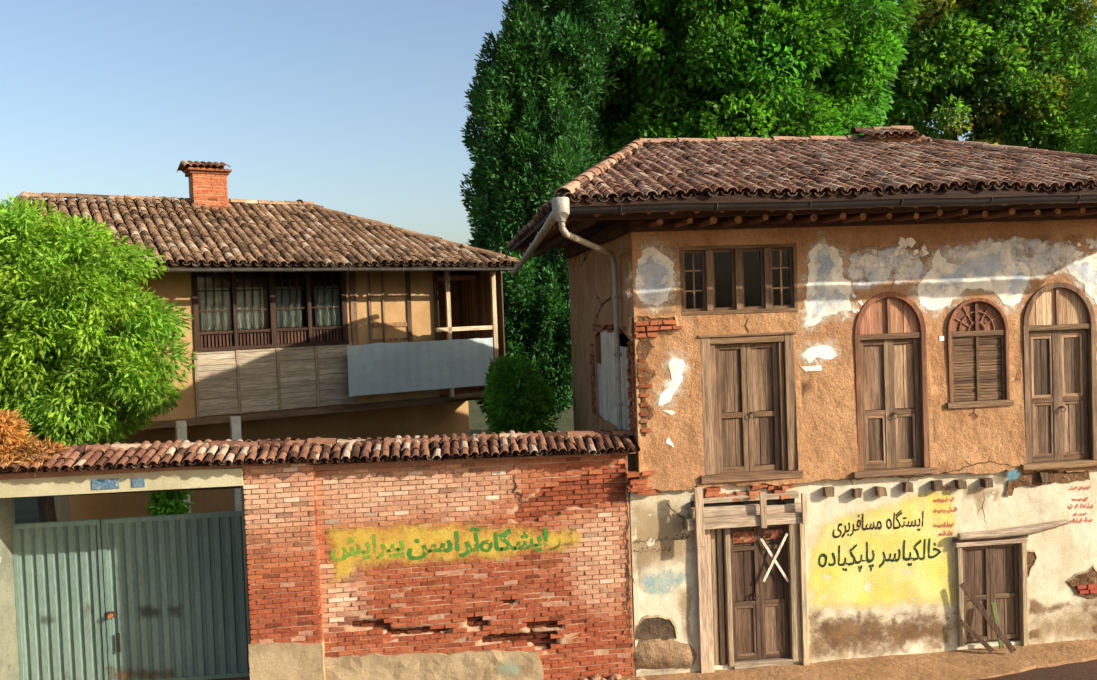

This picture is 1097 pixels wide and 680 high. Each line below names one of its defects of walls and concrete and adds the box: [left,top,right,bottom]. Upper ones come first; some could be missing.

peeling [798,231,1097,372]
peeling [589,241,690,441]
crack [511,475,523,507]
spalling [1006,470,1090,496]
spalling [1066,565,1097,599]
spalling [352,619,449,635]
spalling [467,614,563,647]
damp [810,612,949,657]
damp [1029,600,1097,638]